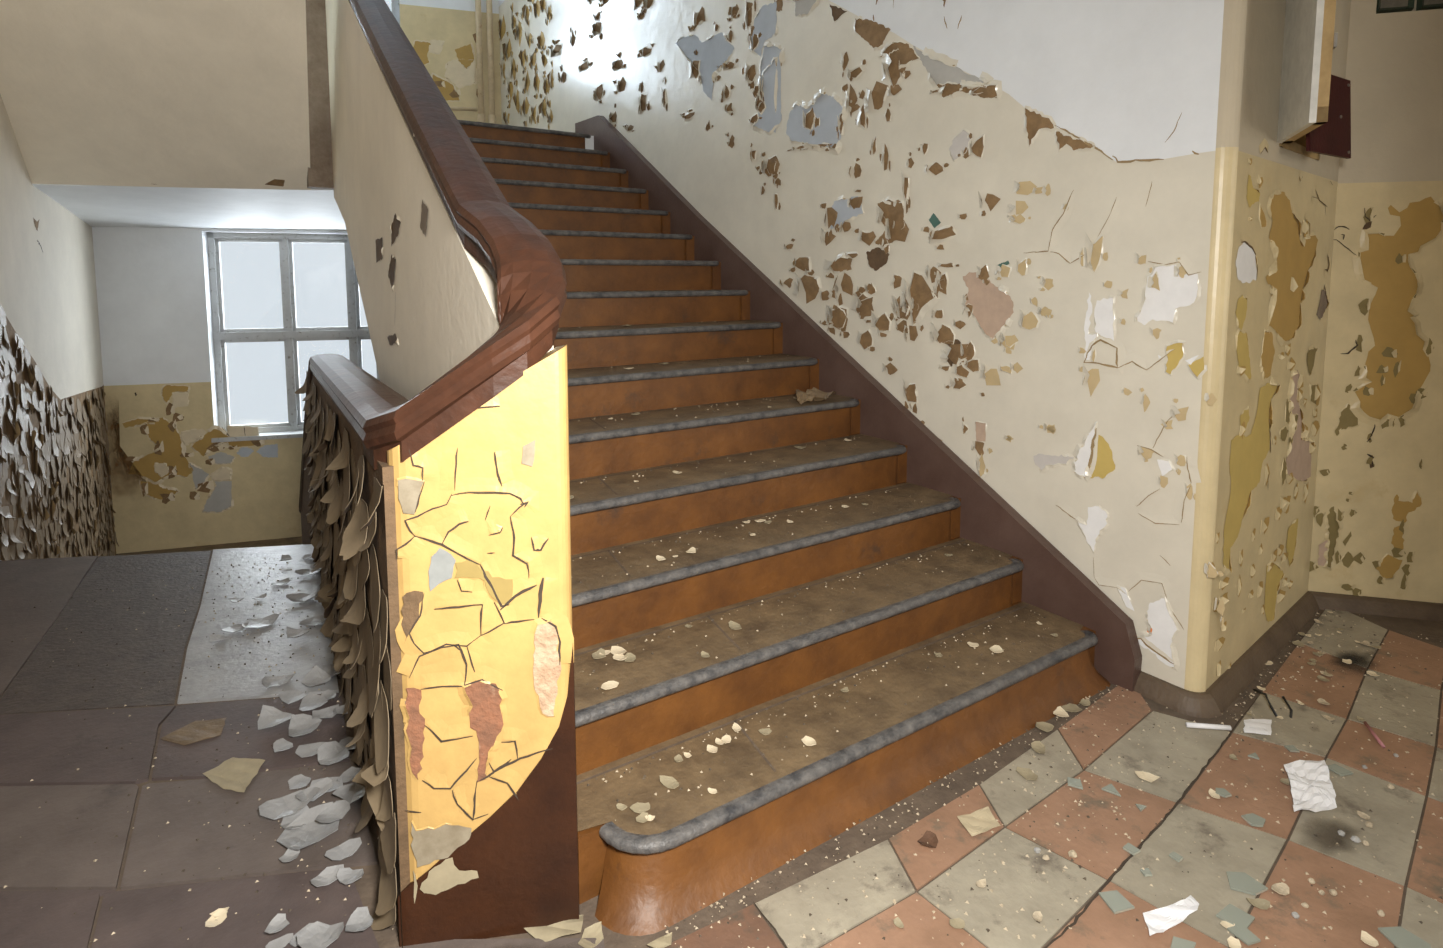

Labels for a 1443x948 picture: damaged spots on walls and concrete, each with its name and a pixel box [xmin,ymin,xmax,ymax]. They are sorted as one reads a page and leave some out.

peeling [413,33,484,102]
peeling [498,0,609,130]
peeling [376,214,401,295]
peeling [420,200,428,237]
peeling [593,0,1217,483]
crack [478,394,500,409]
peeling [1207,158,1443,676]
peeling [295,371,513,948]
crack [395,446,574,820]
spalling [530,617,561,718]
peeling [1117,585,1180,672]
peeling [202,757,265,792]